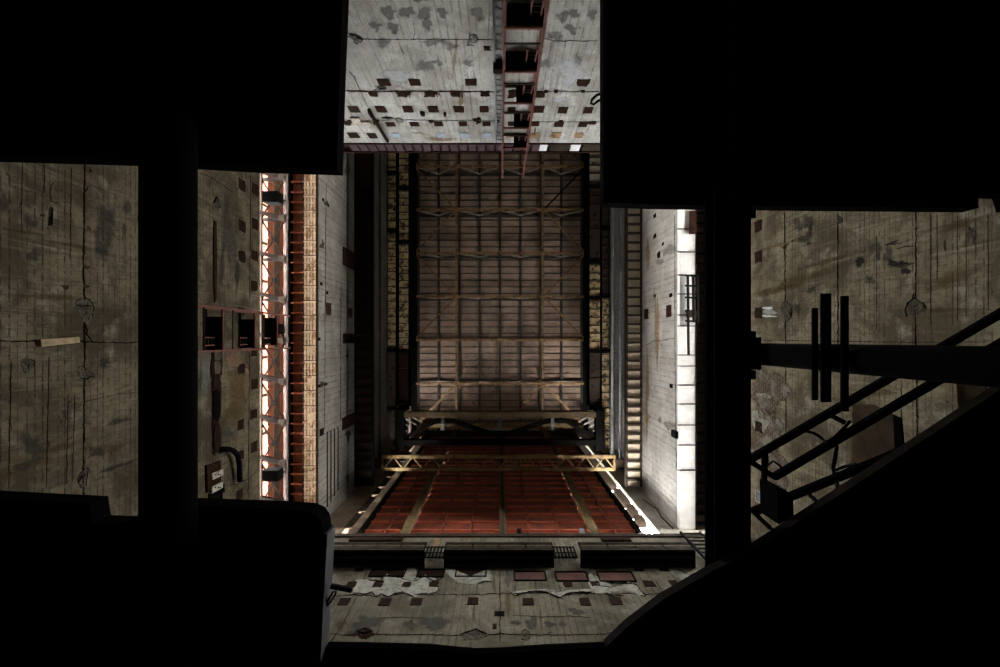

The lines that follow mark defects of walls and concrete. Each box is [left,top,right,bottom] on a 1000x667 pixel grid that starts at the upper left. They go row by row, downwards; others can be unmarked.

leakage [369,0,458,50]
leakage [548,10,597,42]
crack [0,163,138,495]
crack [764,212,989,435]
flaking render [751,368,791,490]
peeling [353,567,491,597]
peeling [510,573,646,598]